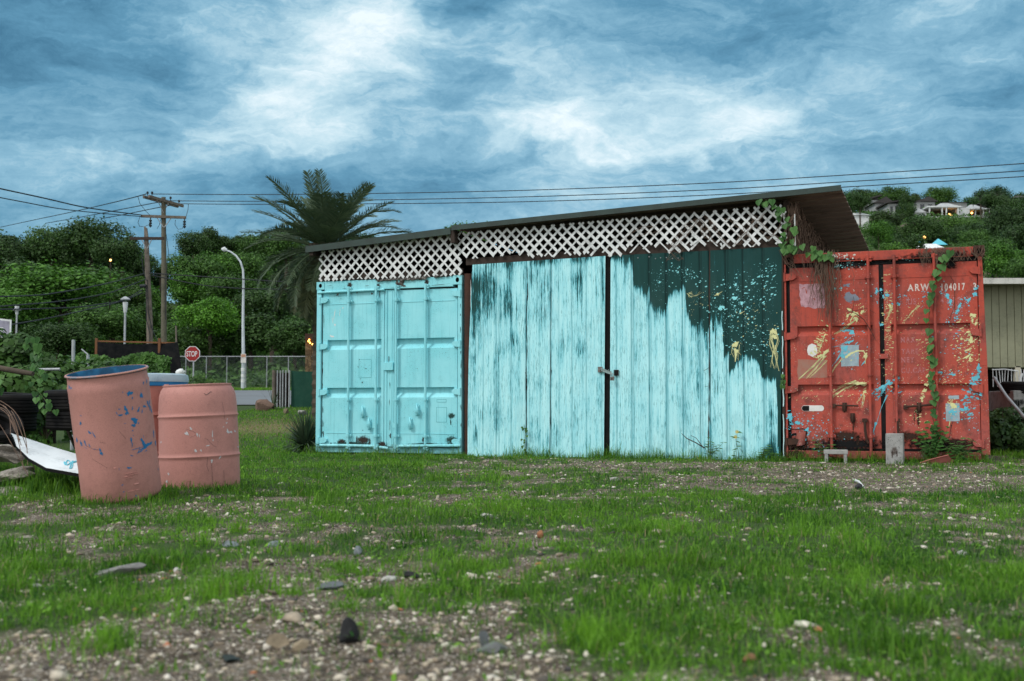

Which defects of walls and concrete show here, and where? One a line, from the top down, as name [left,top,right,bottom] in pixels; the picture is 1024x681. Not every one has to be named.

rust [337,436,386,446]
rust [786,437,812,457]
rust [833,422,863,445]
rust [903,408,920,441]